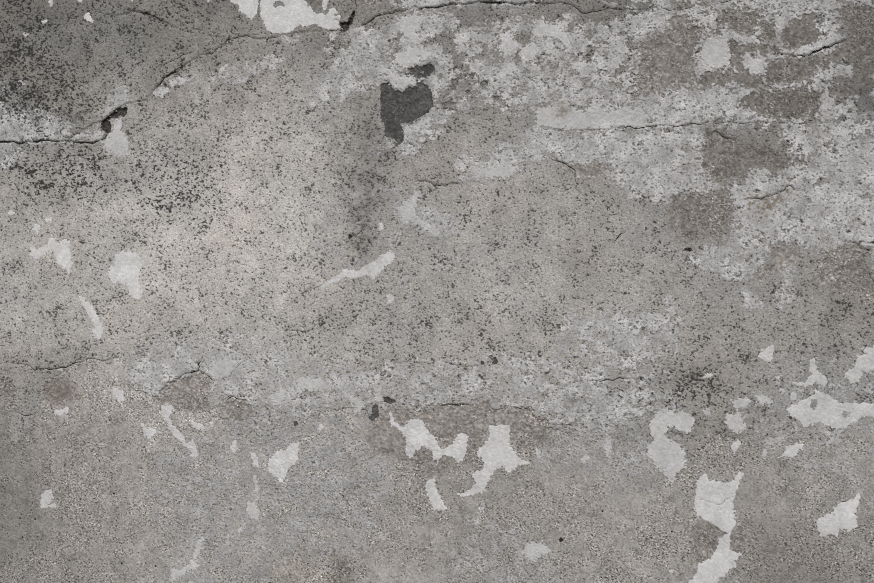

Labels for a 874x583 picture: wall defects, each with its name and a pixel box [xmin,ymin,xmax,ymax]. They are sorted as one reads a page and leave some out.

crack [330,1,695,31]
crack [0,33,293,145]
peeling [150,0,874,315]
peeling [28,234,73,274]
peeling [108,250,143,299]
flaking render [0,295,874,583]